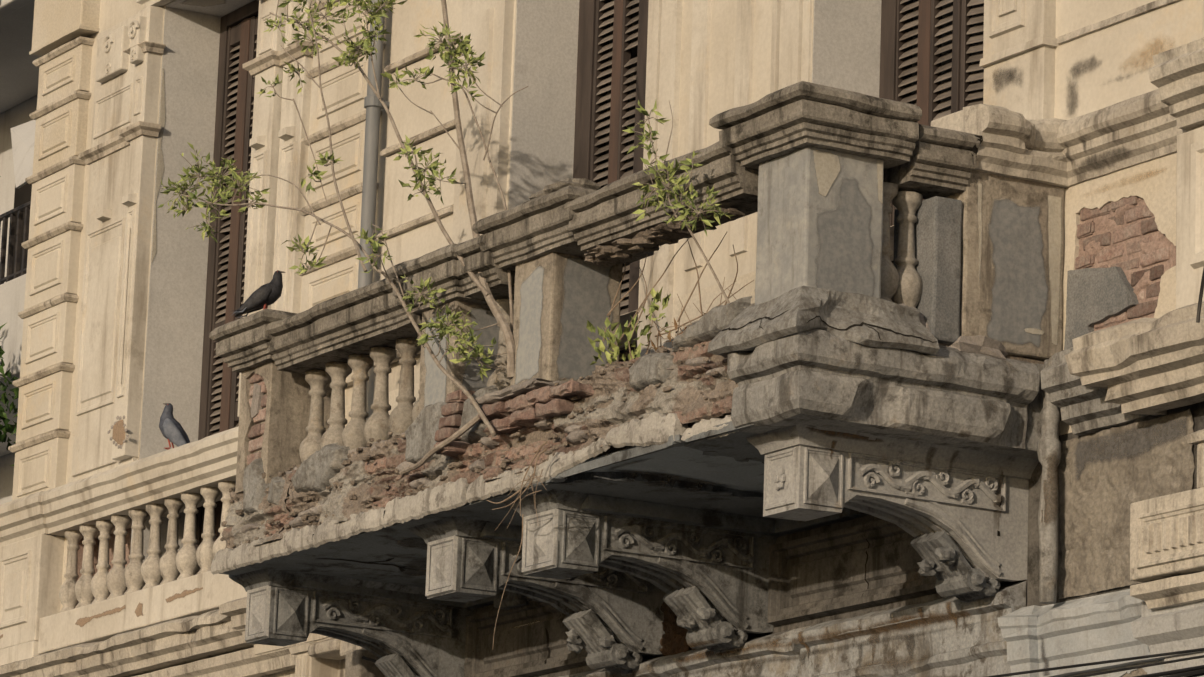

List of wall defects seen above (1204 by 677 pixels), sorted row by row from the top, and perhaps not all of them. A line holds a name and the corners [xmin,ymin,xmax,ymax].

spalling [583,207,745,267]
spalling [1064,196,1176,350]
crack [722,310,937,343]
spalling [220,340,764,550]
spalling [659,602,702,656]
water stain [848,634,924,666]
peeling [1122,668,1147,677]